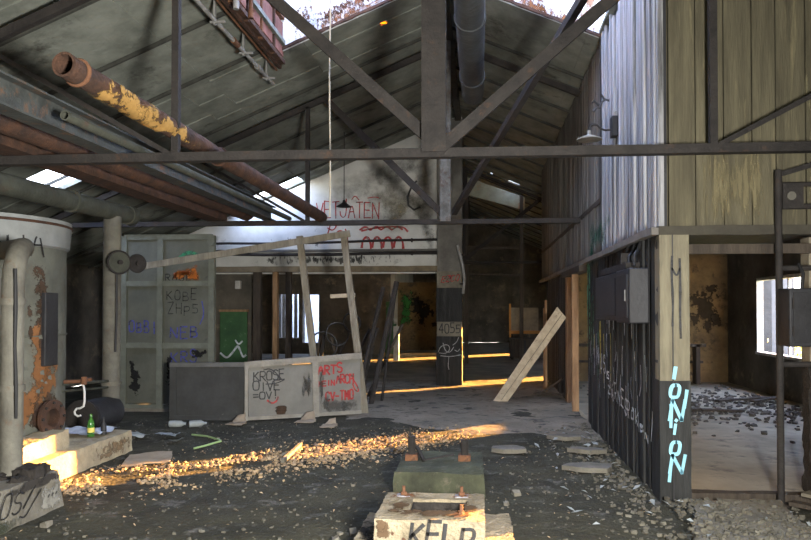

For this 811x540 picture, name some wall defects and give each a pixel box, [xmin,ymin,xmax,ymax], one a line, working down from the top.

rust [28,266,48,358]